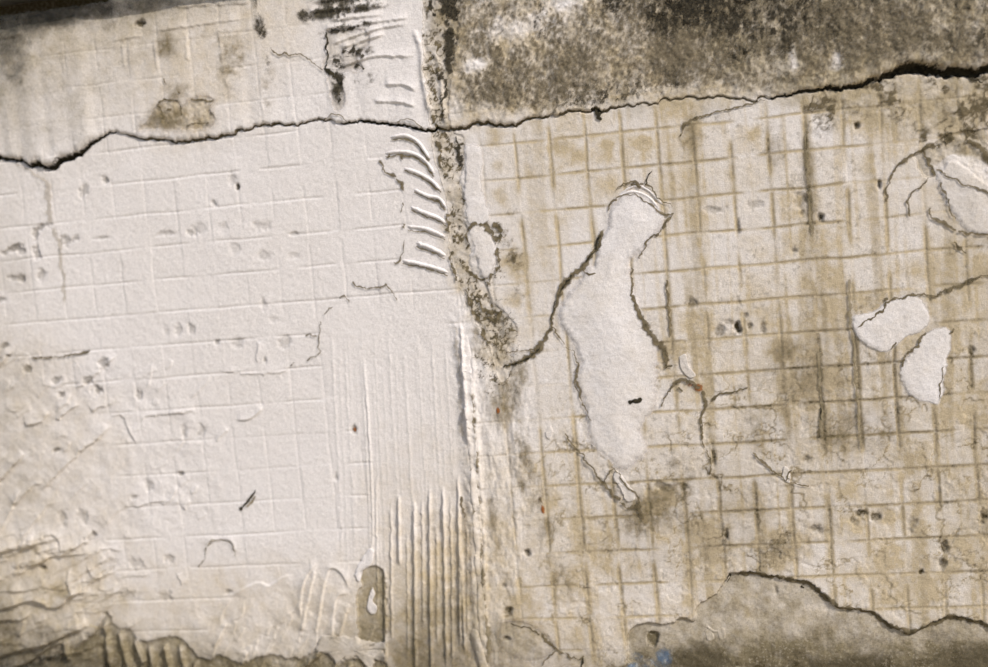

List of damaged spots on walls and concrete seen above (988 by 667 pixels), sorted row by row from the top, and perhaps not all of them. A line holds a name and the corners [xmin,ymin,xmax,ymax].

damp [27,3,112,28]
damp [332,81,343,103]
damp [298,0,379,30]
crack [0,61,988,171]
damp [457,0,988,113]
spalling [804,96,837,130]
spalling [913,73,988,178]
crack [884,143,988,254]
crack [503,171,747,475]
spalling [29,548,387,667]
spalling [627,572,988,667]
crack [726,571,988,636]